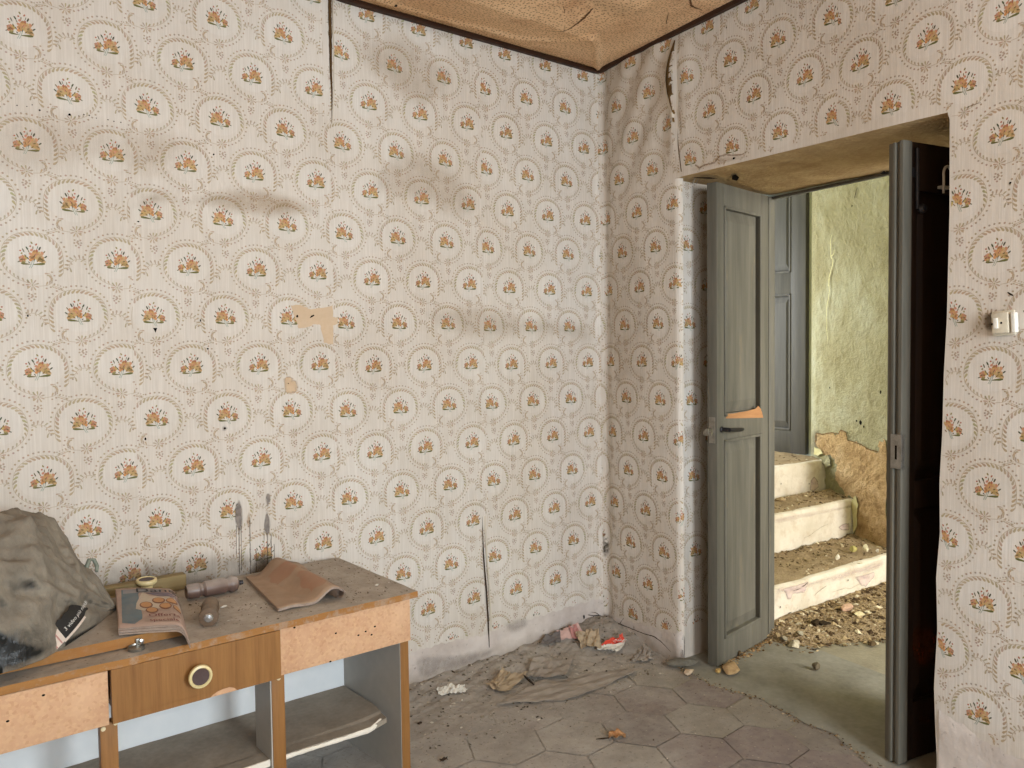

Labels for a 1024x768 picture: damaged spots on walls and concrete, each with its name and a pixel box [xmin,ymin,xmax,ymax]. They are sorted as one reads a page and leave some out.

peeling [291,305,338,344]
peeling [285,377,297,393]
spalling [814,430,887,552]